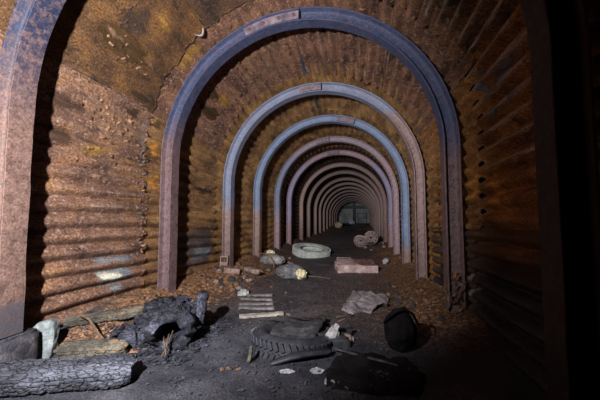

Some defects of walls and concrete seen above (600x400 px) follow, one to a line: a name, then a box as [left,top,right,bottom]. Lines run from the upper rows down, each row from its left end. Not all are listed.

efflorescence [92,256,131,291]